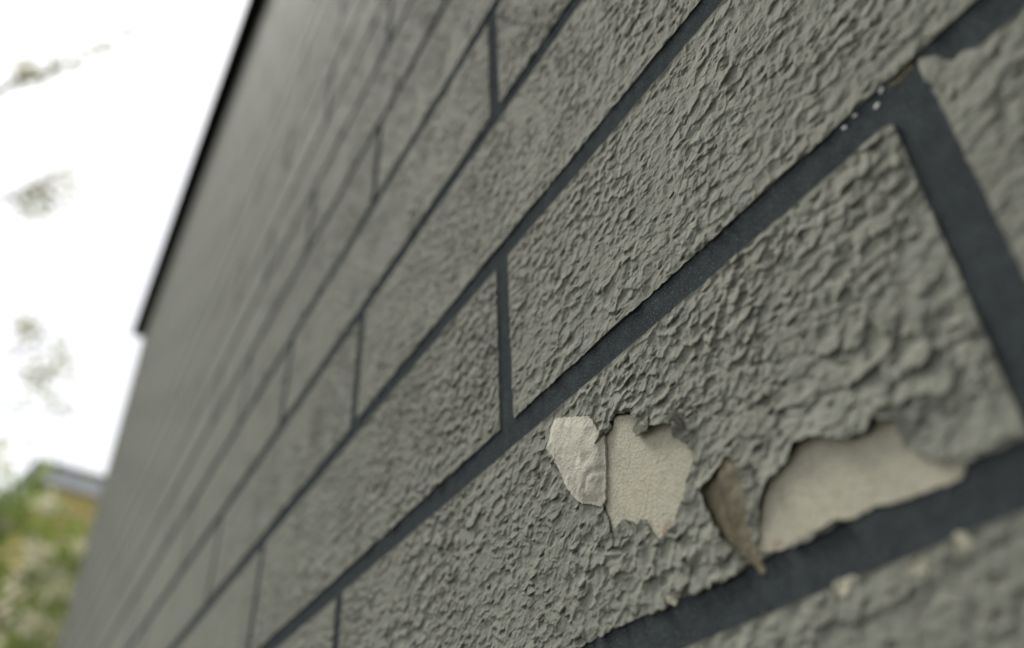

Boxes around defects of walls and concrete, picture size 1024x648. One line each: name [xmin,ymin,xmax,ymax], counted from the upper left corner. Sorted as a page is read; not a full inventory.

peeling [546,407,694,539]
peeling [702,418,968,576]
spalling [952,532,972,554]